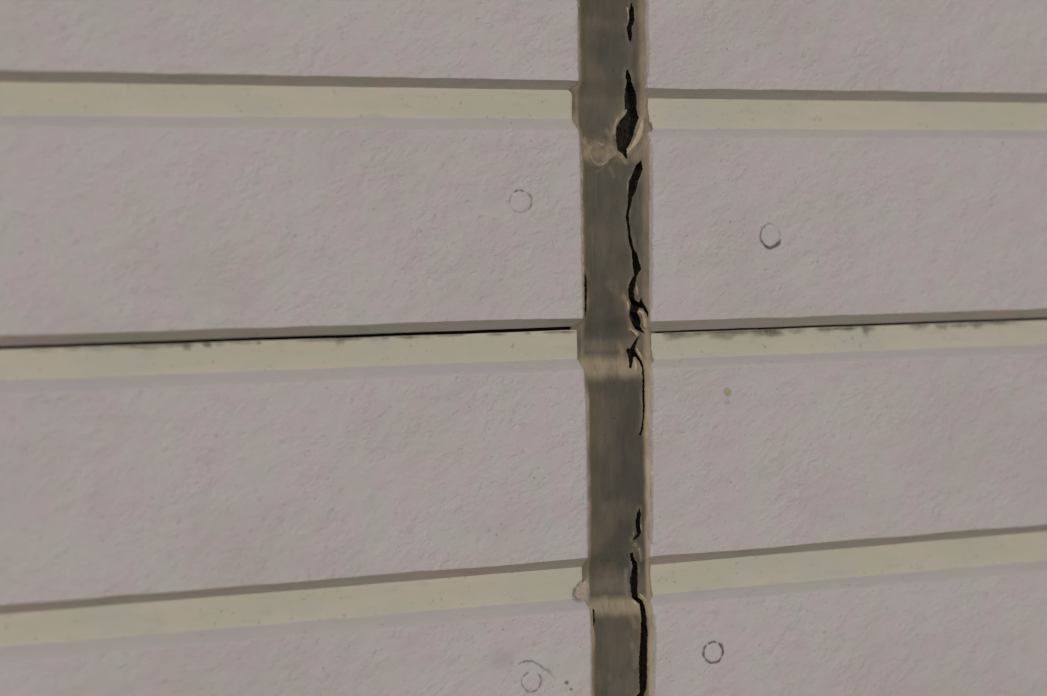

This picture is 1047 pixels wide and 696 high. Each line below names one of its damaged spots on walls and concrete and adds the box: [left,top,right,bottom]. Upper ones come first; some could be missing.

crack [627,3,635,42]
crack [590,70,648,436]
crack [628,508,648,696]